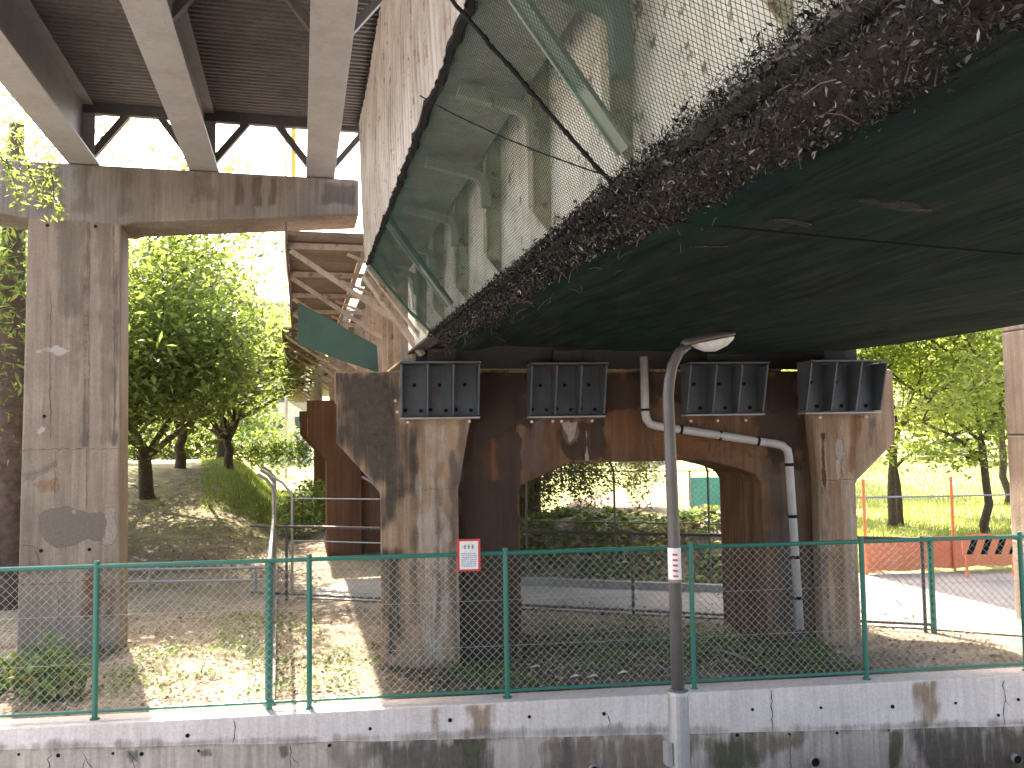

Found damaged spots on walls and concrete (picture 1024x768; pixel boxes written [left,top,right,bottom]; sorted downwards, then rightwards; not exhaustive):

crack [21,225,117,507]
spalling [39,506,118,548]
crack [770,691,792,767]
damp [889,683,1024,768]